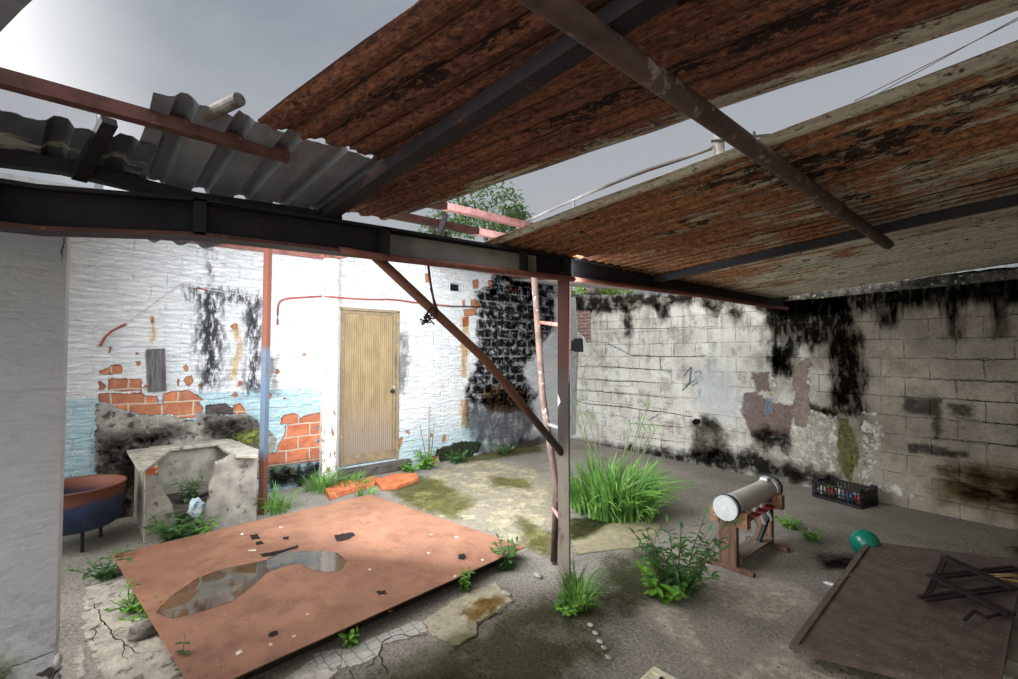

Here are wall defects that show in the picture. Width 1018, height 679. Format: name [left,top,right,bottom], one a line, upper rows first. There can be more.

water stain [192,289,261,393]
water stain [502,275,557,353]
water stain [571,265,1018,463]
flaking render [94,346,320,519]
peeling [741,357,839,473]
peeling [856,411,915,498]
water stain [946,468,1018,511]
water stain [819,555,854,568]
crack [84,575,159,660]
water stain [475,598,499,618]